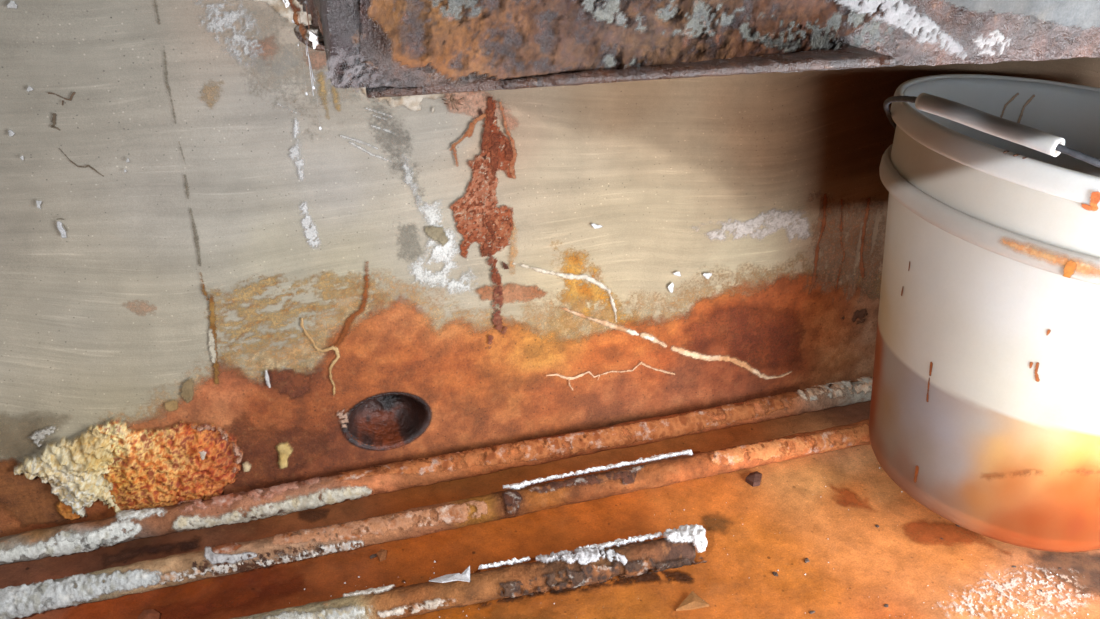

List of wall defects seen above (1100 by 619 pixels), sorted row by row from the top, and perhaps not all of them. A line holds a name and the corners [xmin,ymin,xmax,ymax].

flaking render [253,0,312,26]
flaking render [360,87,445,113]
crack [164,52,219,384]
corrosion [108,91,882,495]
crack [513,263,791,390]
spalling [342,392,432,451]
corrosion [0,499,116,537]
corrosion [300,509,329,522]
corrosion [703,516,728,531]
corrosion [905,521,992,546]
spalling [192,544,322,576]
corrosion [482,571,693,607]